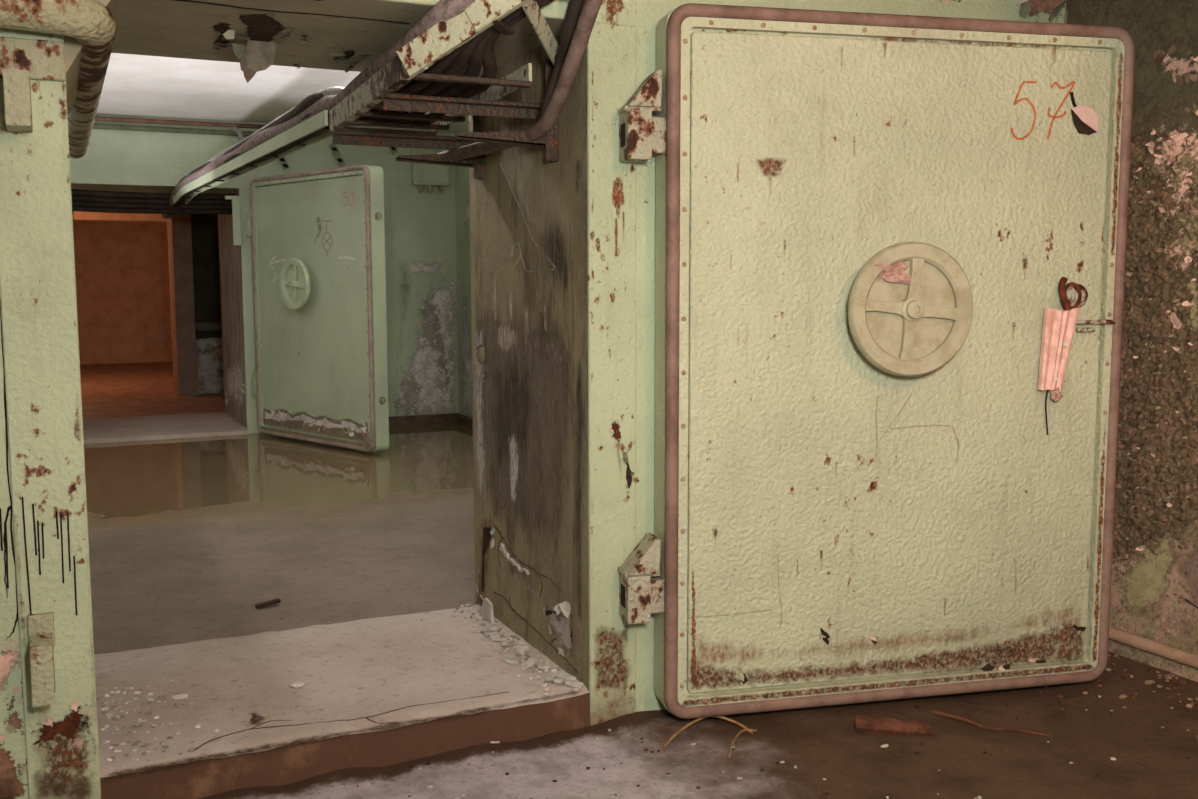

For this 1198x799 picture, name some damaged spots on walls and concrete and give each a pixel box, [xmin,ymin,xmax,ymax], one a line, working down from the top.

peeling [212,12,313,83]
peeling [329,45,372,73]
rust [602,0,624,25]
peeling [1151,44,1198,87]
peeling [394,256,473,417]
peeling [1112,102,1198,616]
damp [474,280,582,616]
rust [683,433,1105,706]
spalling [543,601,574,657]
rust [596,630,628,688]
peeling [0,637,92,799]
rust [45,721,88,783]